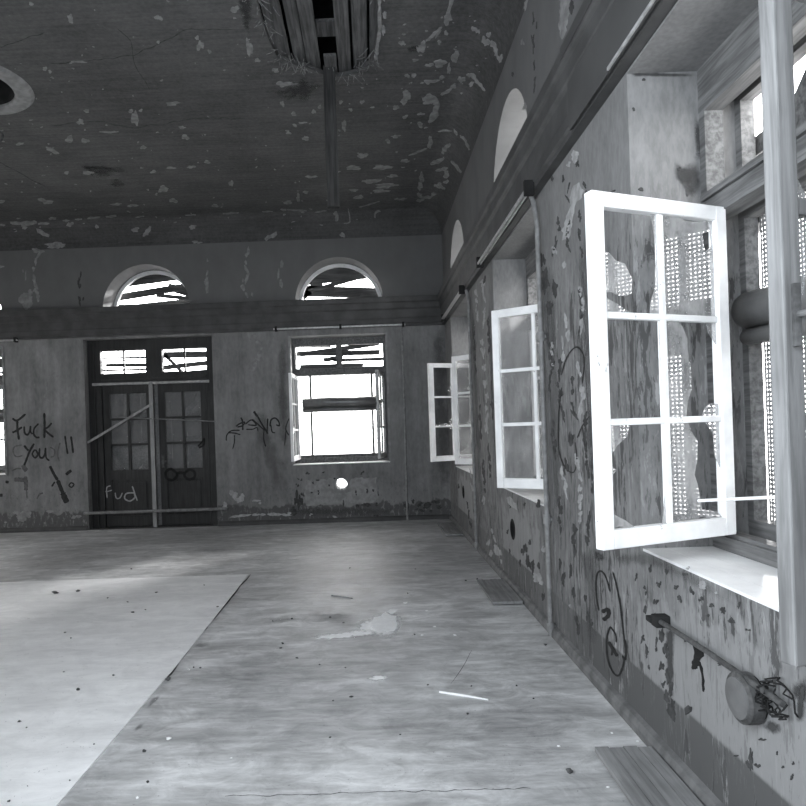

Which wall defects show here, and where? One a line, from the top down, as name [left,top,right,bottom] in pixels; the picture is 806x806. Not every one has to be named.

spalling [246,0,386,87]
peeling [393,0,485,128]
peeling [349,143,462,218]
peeling [0,203,151,310]
peeling [540,150,587,316]
peeling [473,275,494,505]
peeling [223,471,379,518]
peeling [546,286,594,635]
peeling [519,540,545,601]
peeling [641,628,692,722]
spalling [684,640,705,692]
peeling [733,747,761,771]